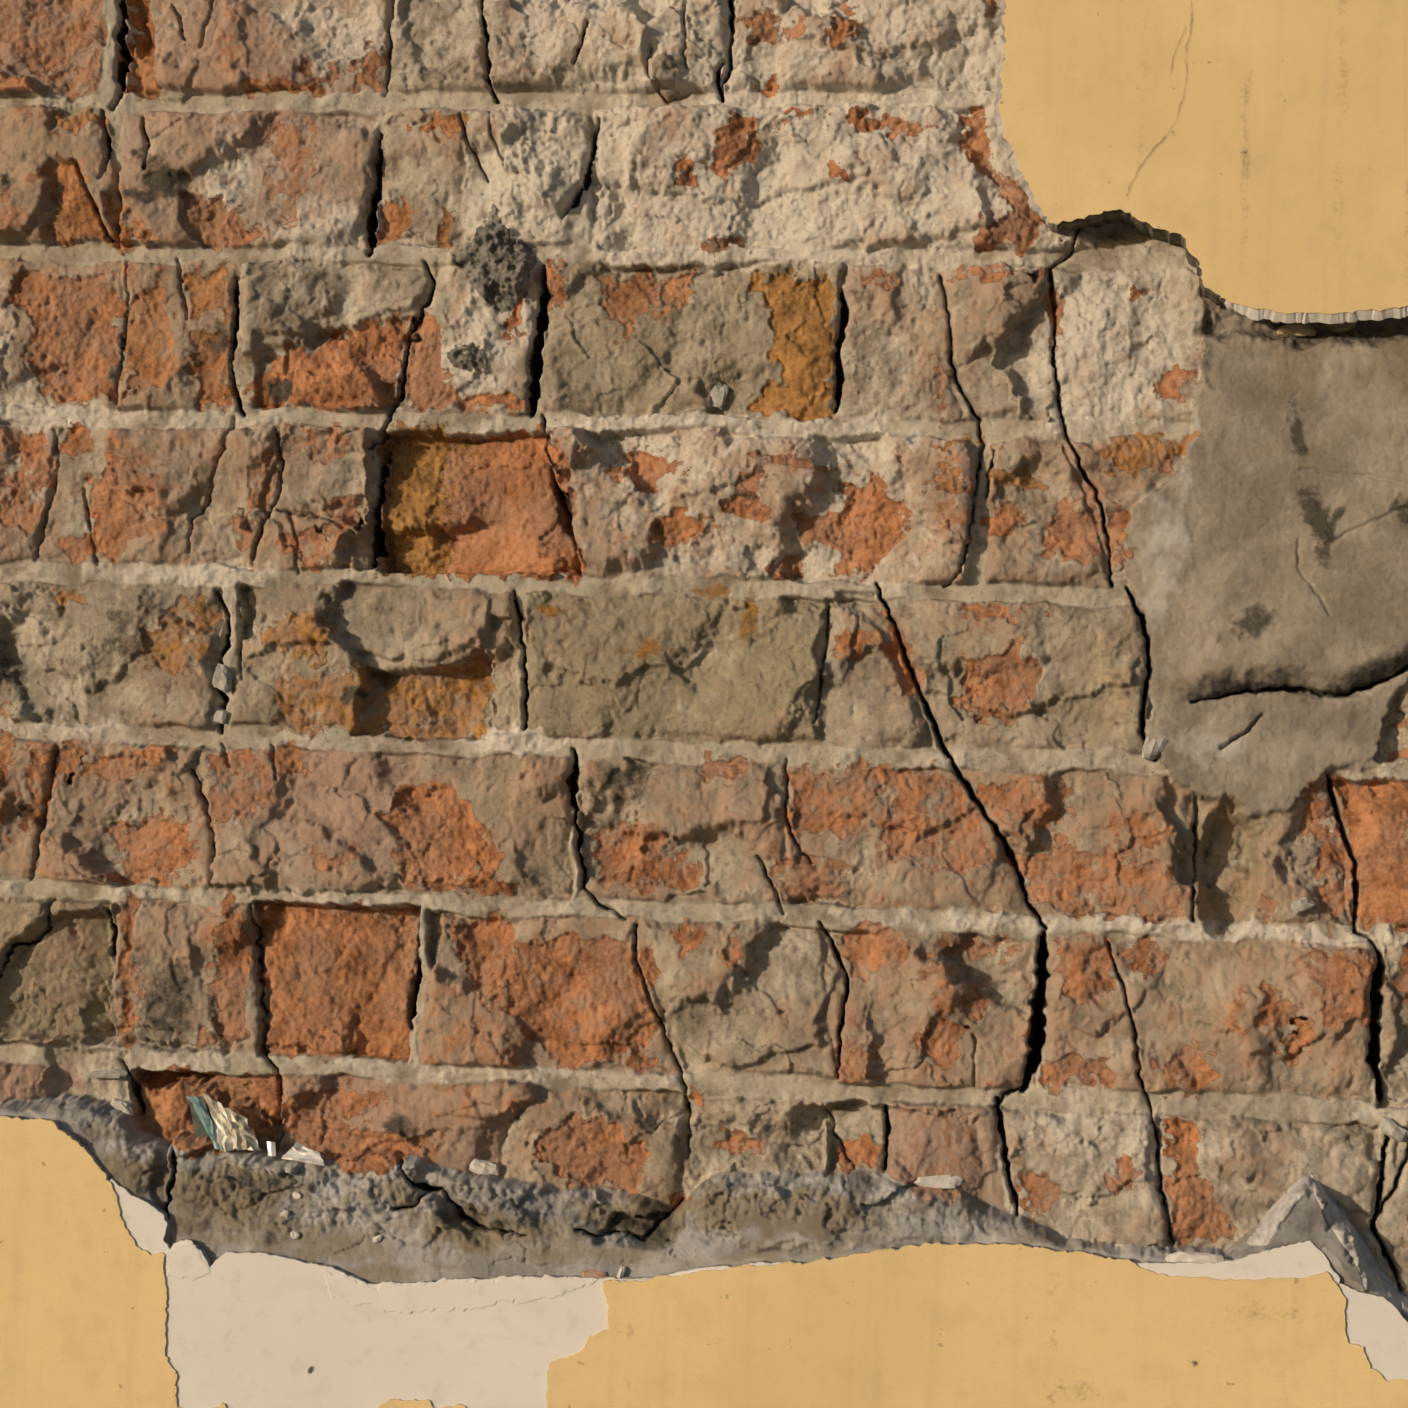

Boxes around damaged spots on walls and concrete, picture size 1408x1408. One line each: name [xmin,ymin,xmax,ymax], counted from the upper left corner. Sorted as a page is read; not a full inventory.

spalling [0,40,586,593]
spalling [648,450,913,583]
spalling [947,105,1066,353]
crack [1051,326,1108,538]
spalling [207,608,498,826]
crack [877,586,1047,929]
crack [1109,576,1156,761]
spalling [921,290,1408,1068]
crack [1192,665,1408,703]
crack [565,750,692,1138]
spalling [0,758,1408,1408]
crack [1370,1138,1408,1278]